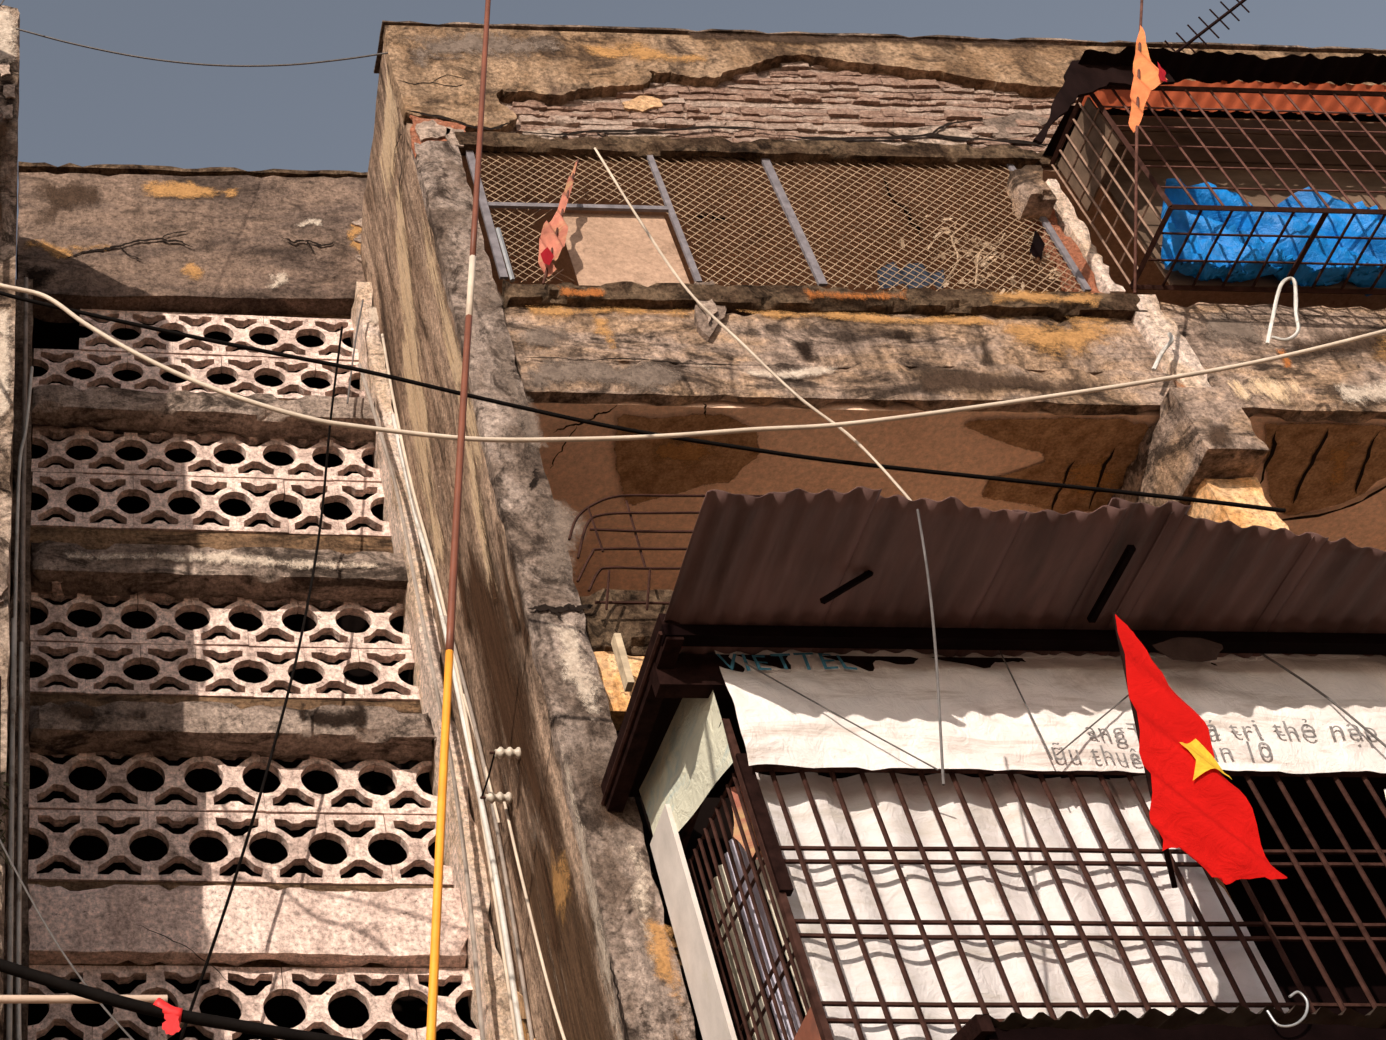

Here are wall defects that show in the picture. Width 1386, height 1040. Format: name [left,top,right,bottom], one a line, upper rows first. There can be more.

spalling [380,61,1078,583]